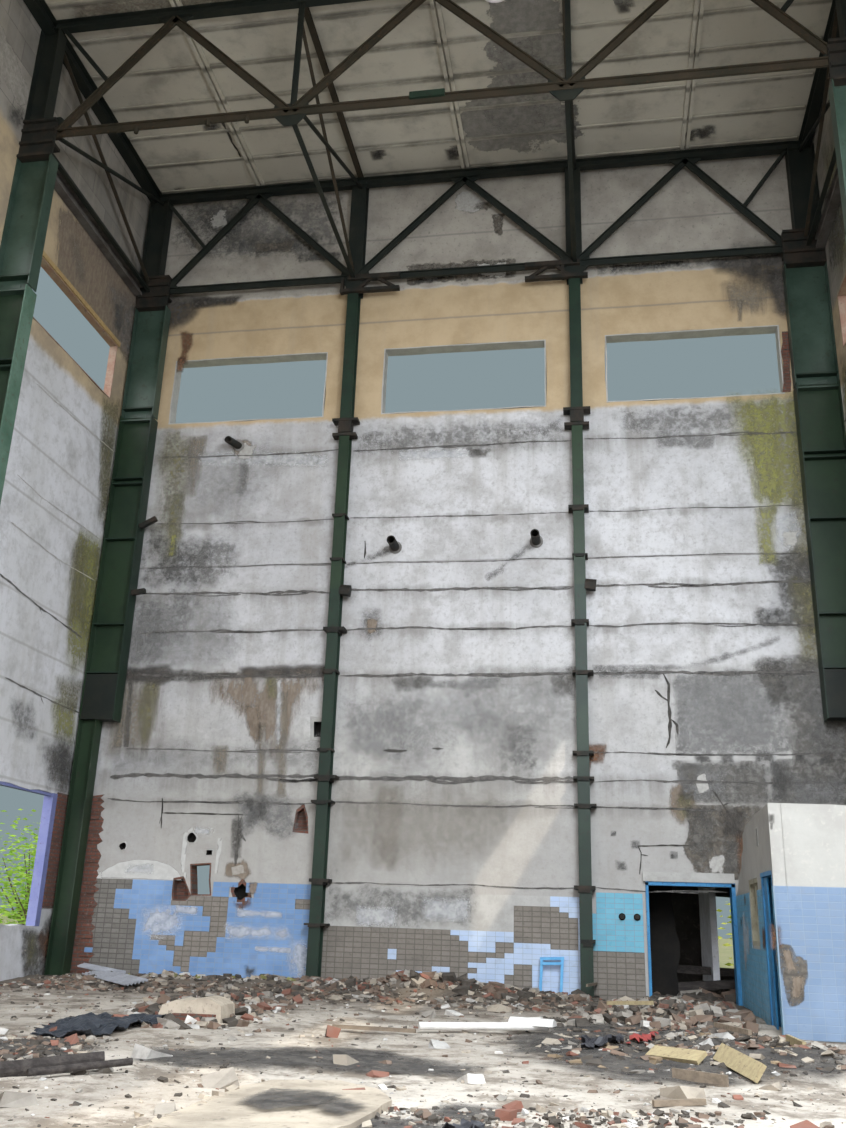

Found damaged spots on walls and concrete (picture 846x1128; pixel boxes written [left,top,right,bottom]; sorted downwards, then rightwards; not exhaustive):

peeling [446,0,583,159]
damp [599,257,786,320]
damp [143,438,233,584]
damp [596,401,846,822]
damp [111,683,157,751]
damp [171,670,316,856]
crack [108,670,827,865]
peeling [70,794,140,976]
peeling [151,860,252,972]
flaking render [321,885,578,989]
spalling [671,805,773,880]
spalling [776,944,808,1006]